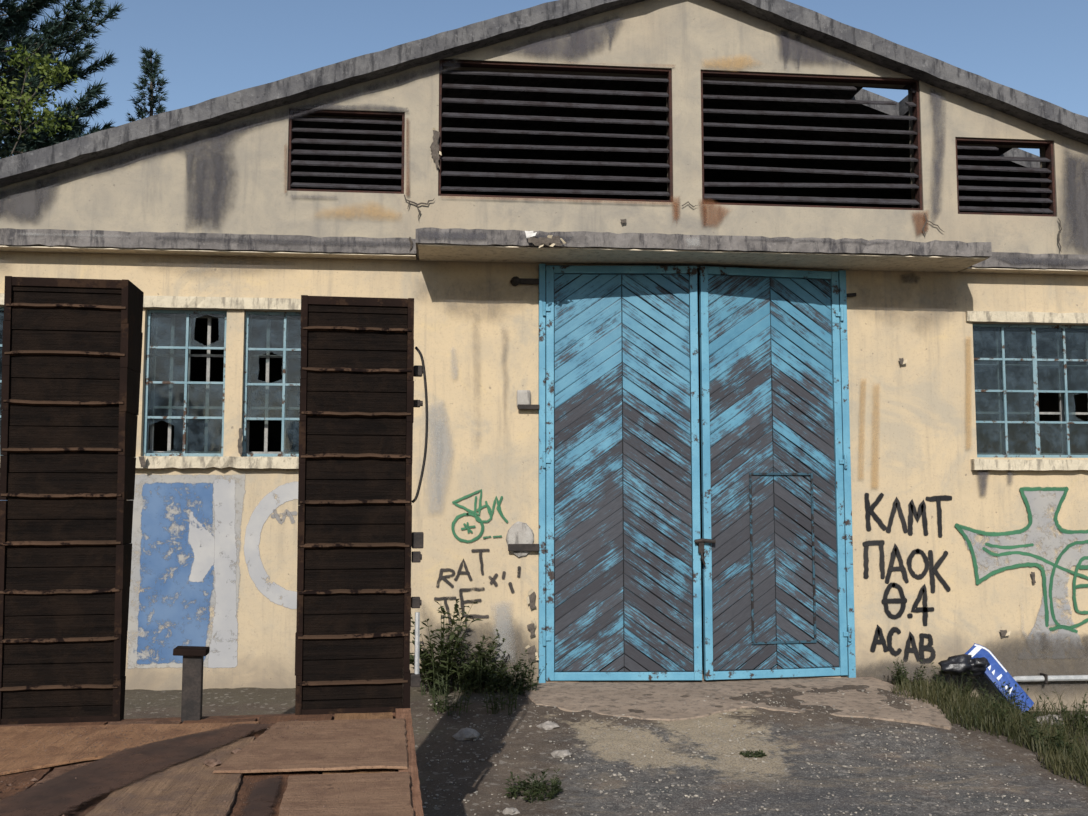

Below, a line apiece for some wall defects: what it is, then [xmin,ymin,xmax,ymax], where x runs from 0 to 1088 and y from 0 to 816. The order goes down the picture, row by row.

leakage [779,31,847,65]
leakage [0,63,451,223]
crack [404,195,434,251]
rust [701,201,724,225]
rust [913,212,928,233]
leakage [1000,152,1088,265]